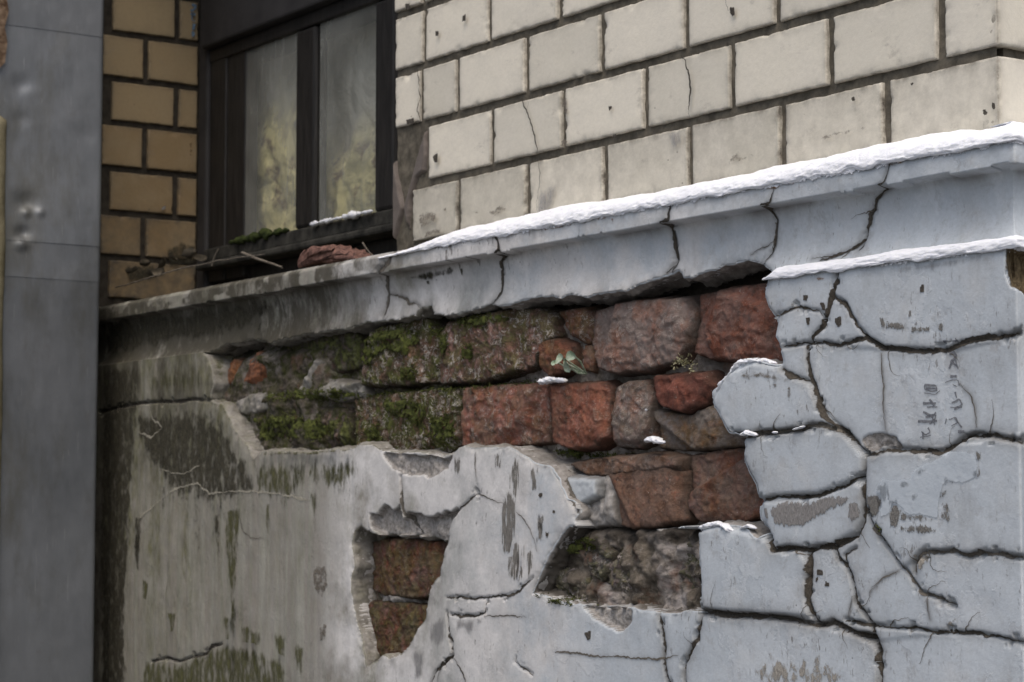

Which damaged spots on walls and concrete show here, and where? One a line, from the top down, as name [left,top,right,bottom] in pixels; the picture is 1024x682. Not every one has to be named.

crack [378,251,420,315]
crack [493,237,507,303]
crack [104,398,210,439]
spalling [203,260,981,631]
crack [555,164,1024,682]
crack [140,466,310,539]
leakage [101,370,353,682]
spalling [351,505,460,667]
crack [432,579,532,682]